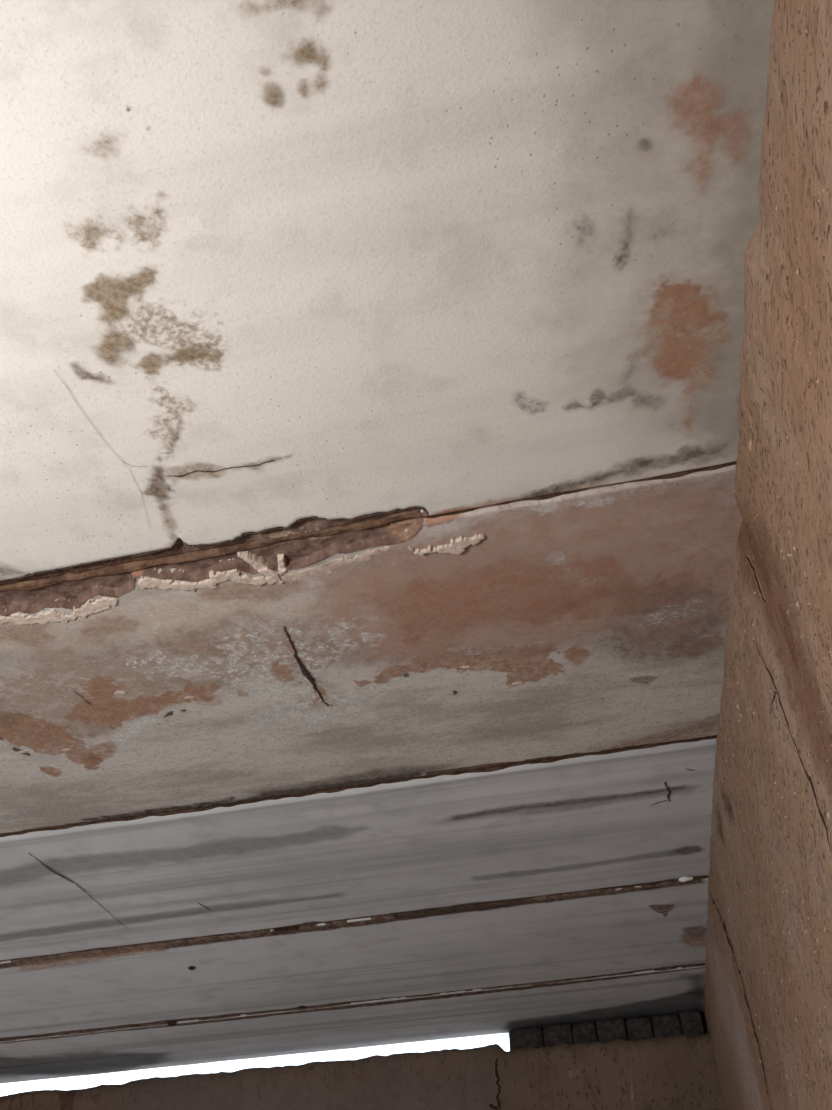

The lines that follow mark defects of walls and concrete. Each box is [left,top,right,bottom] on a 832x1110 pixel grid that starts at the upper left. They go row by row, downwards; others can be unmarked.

leakage [266,89,281,105]
leakage [295,44,326,65]
leakage [86,269,218,374]
rust [652,284,726,393]
leakage [146,467,173,536]
spalling [0,502,493,625]
crack [284,627,332,707]
crack [755,640,832,859]
crack [29,853,127,928]
crack [708,885,772,1110]